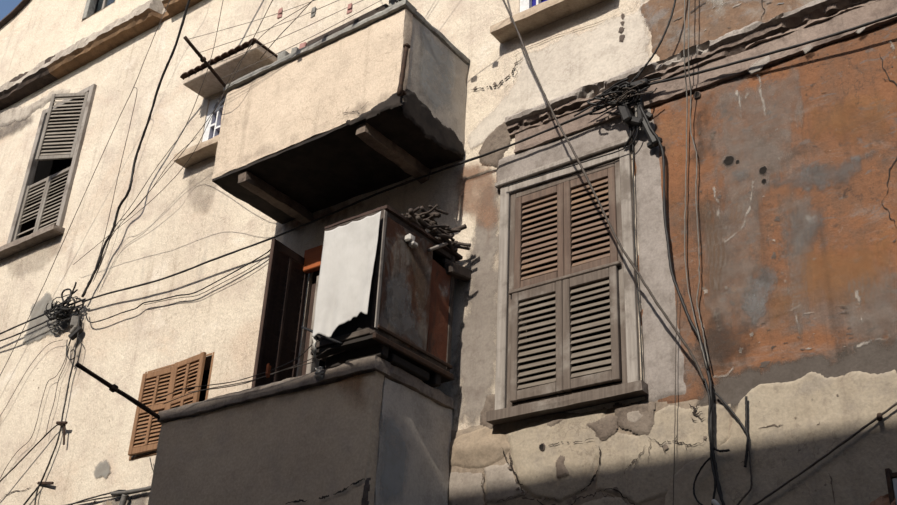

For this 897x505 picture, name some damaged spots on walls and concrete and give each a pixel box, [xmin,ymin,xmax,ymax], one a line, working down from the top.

crack [471,1,637,90]
crack [881,158,897,227]
peeling [448,21,897,505]
crack [286,479,365,504]
crack [481,403,707,505]